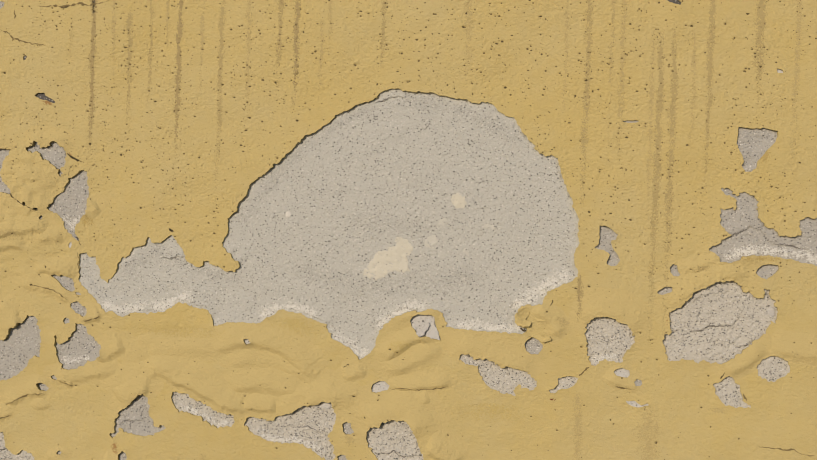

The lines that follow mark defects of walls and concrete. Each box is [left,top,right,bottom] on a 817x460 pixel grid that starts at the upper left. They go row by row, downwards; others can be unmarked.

spalling [737,127,777,174]
spalling [28,141,94,248]
spalling [53,81,580,370]
spalling [662,188,817,364]
spalling [0,316,41,381]
spalling [111,395,165,437]
spalling [172,392,235,428]
spalling [245,402,354,460]
spalling [367,420,424,460]
spalling [459,354,537,396]
spalling [549,376,578,393]
spalling [580,317,642,386]